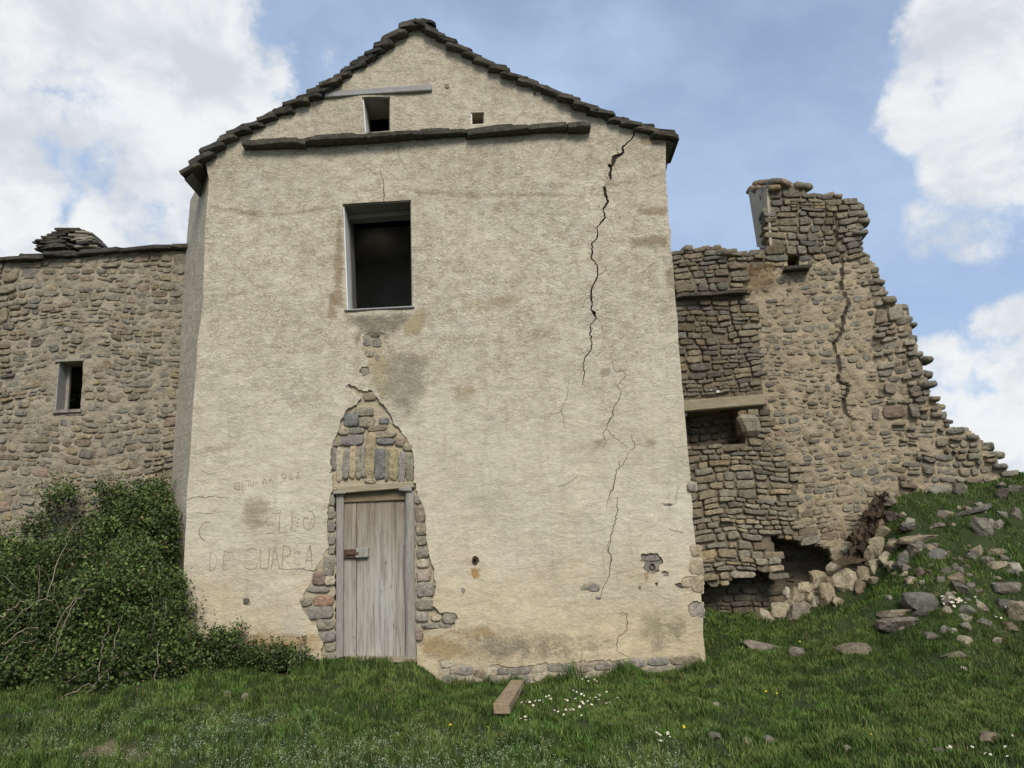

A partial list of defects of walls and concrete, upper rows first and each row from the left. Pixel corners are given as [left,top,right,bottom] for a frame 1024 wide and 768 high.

spalling [360,332,386,376]
crack [549,134,635,594]
crack [833,212,865,420]
spalling [300,385,458,660]
spalling [640,544,705,618]